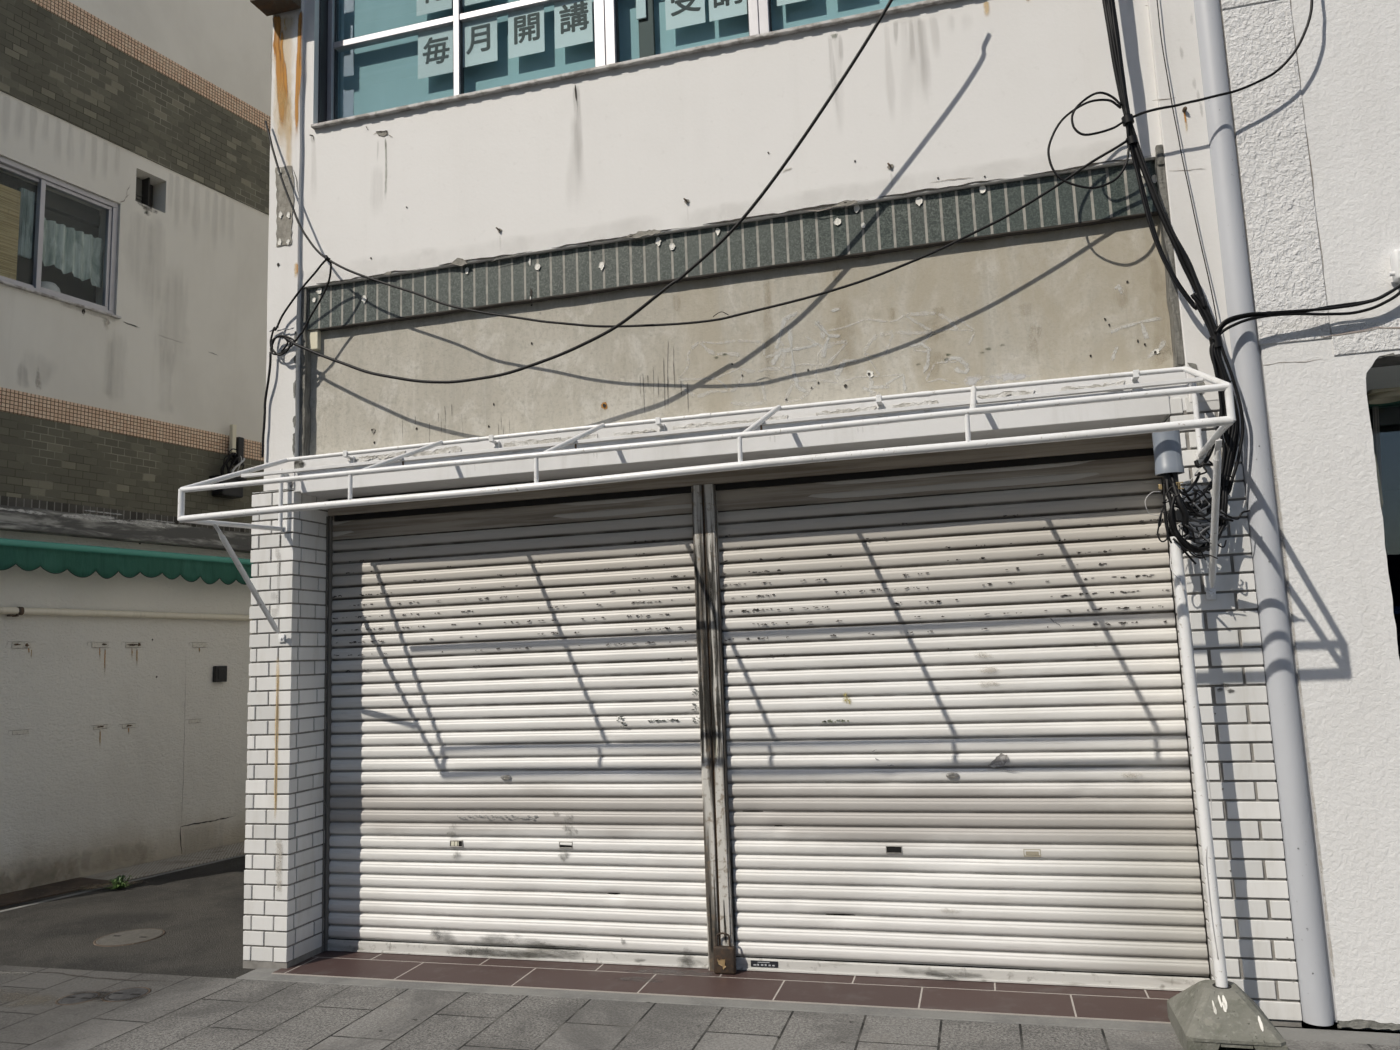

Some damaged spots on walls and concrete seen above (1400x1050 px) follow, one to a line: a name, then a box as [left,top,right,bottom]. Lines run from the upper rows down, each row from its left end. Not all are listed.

rust [273,11,303,129]